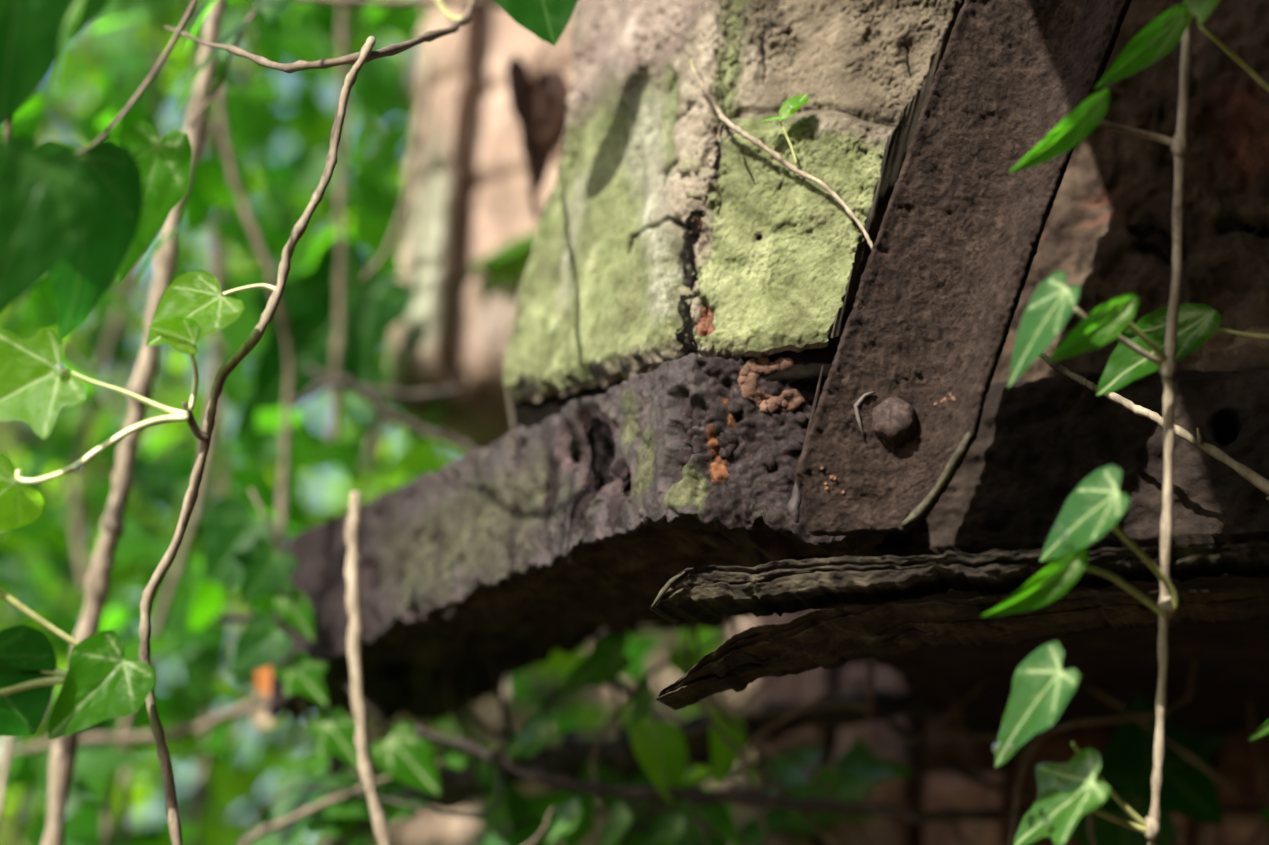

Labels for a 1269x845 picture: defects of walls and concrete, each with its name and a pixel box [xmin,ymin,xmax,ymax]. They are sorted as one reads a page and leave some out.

water stain [712,0,956,145]
water stain [564,0,704,322]
peeling [517,373,542,395]
water stain [541,283,575,390]
peeling [565,346,651,385]
spalling [589,421,632,494]
spalling [680,396,707,426]
corrosion [705,399,735,483]